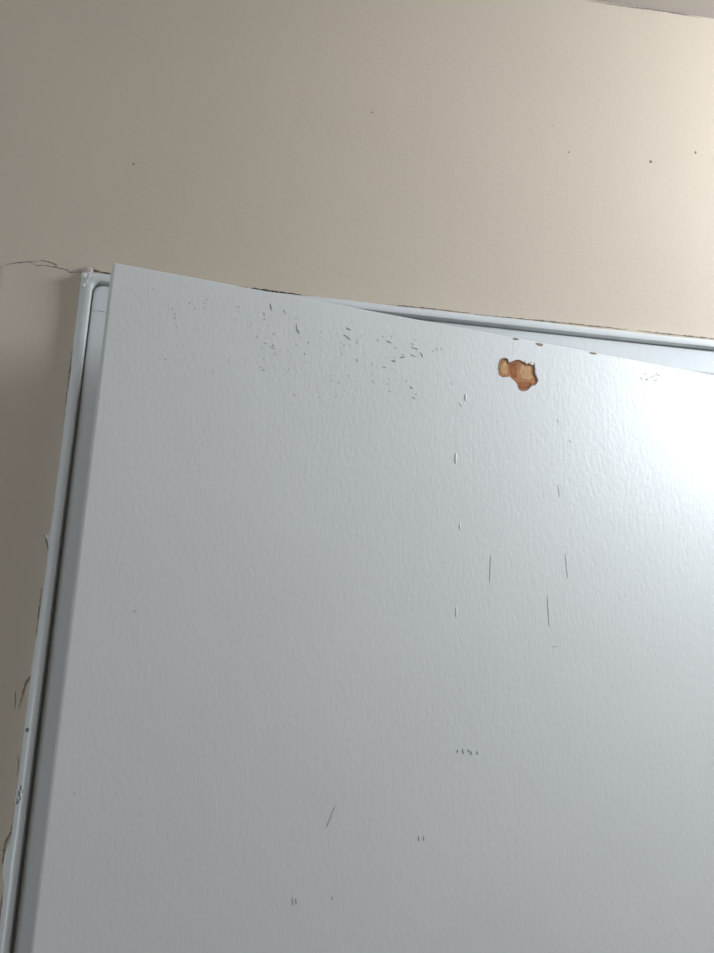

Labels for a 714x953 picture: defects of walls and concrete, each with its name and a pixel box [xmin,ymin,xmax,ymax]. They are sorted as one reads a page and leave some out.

crack [5,260,111,283]
crack [240,286,304,296]
crack [386,304,714,339]